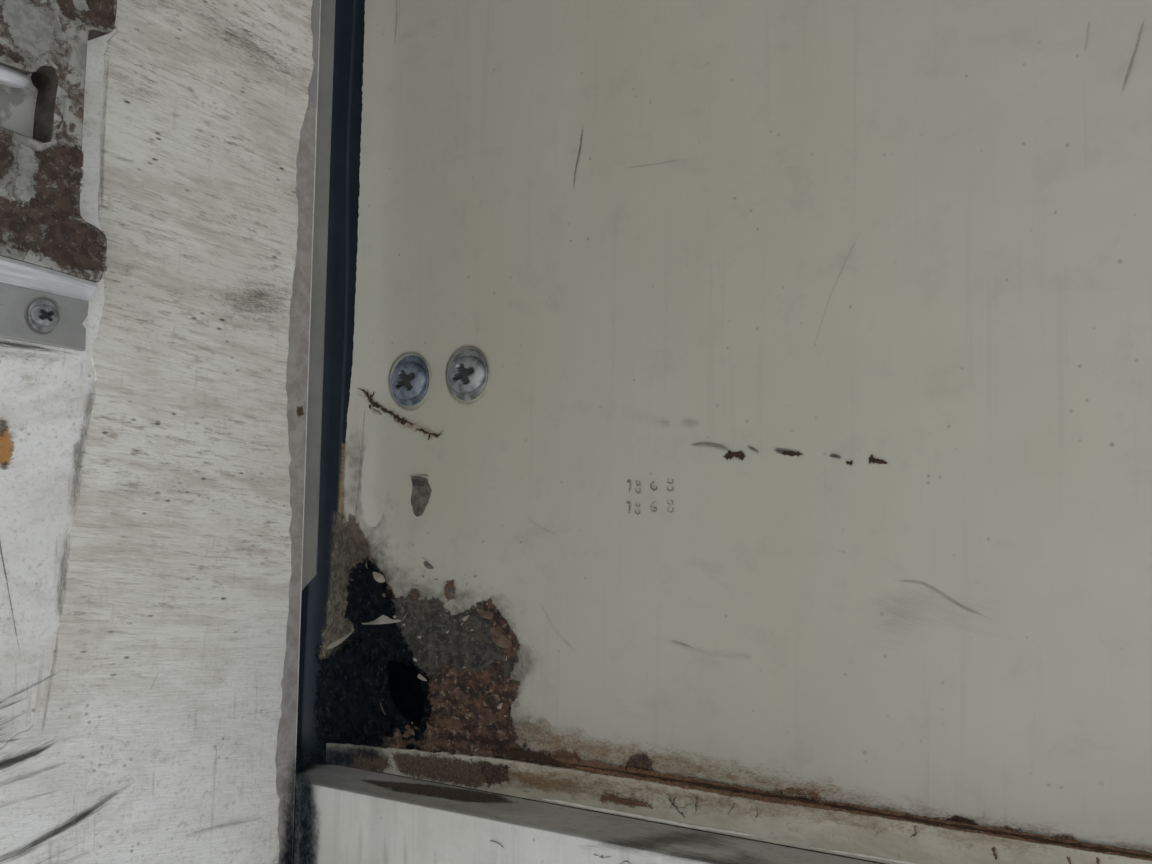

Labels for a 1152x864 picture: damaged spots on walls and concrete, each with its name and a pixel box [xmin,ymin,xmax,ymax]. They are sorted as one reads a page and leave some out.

corrosion [57,0,116,29]
corrosion [0,44,24,63]
corrosion [0,129,14,179]
corrosion [0,145,107,274]
corrosion [0,420,14,469]
peeling [409,474,432,517]
corrosion [319,444,371,658]
peeling [327,558,477,650]
corrosion [349,582,1152,861]